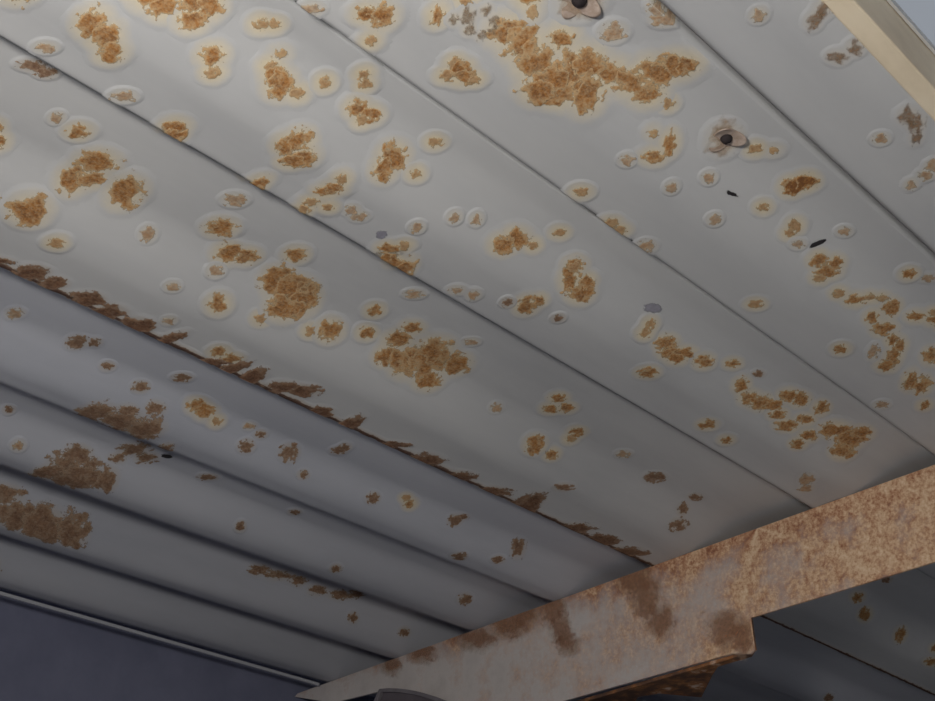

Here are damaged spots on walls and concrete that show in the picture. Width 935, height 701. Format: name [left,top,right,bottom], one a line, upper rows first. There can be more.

rust [7,0,935,416]
rust [0,107,658,566]
rust [627,311,885,467]
rust [637,469,672,486]
rust [663,490,709,535]
rust [843,587,879,627]
rust [760,614,935,696]